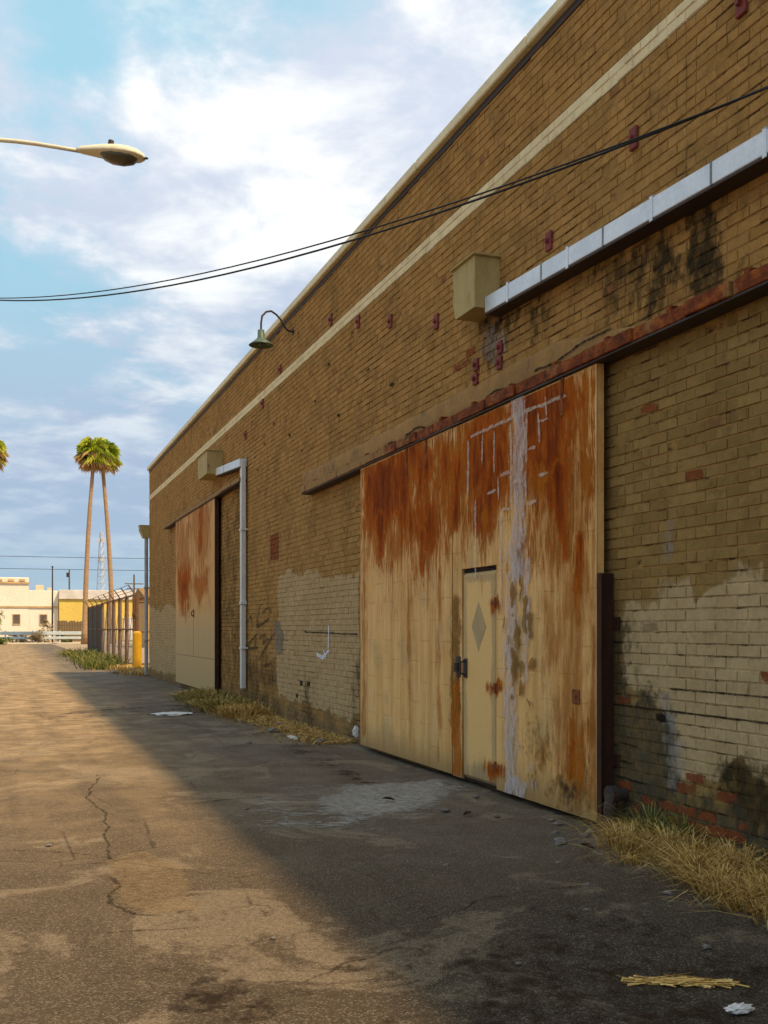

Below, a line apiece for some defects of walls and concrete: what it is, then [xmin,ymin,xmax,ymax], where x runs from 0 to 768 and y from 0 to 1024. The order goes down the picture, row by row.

damp [648,231,670,309]
damp [686,204,723,296]
rust [176,507,210,616]
rust [360,369,595,800]
damp [503,397,529,795]
damp [614,623,768,867]
spalling [615,773,748,843]